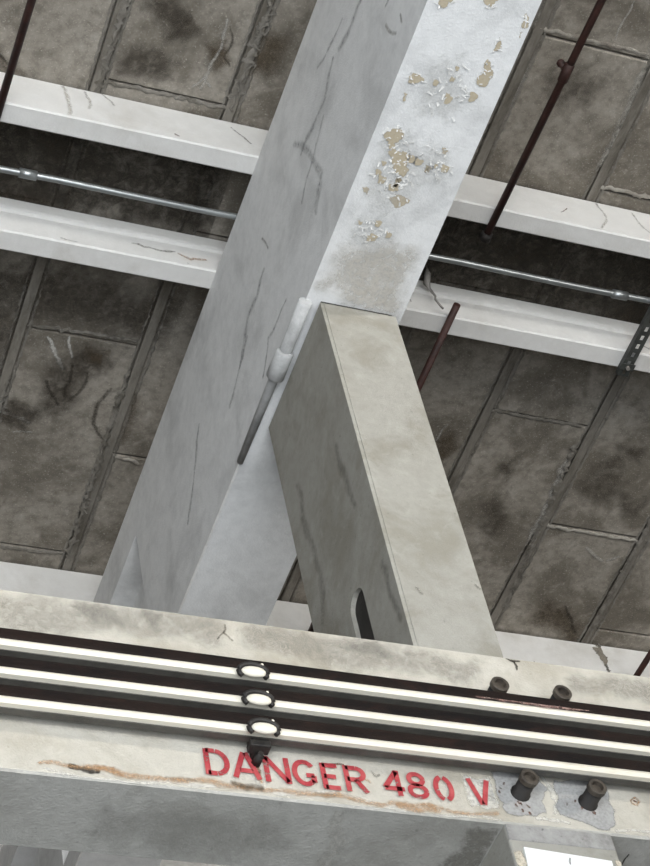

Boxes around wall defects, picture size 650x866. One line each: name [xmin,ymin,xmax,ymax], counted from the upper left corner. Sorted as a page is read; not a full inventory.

leakage [119,51,168,74]
peeling [406,72,427,85]
peeling [475,37,503,87]
peeling [382,125,410,208]
leakage [0,336,103,432]
leakage [435,424,455,461]
rust [86,766,187,782]
rust [202,767,274,791]